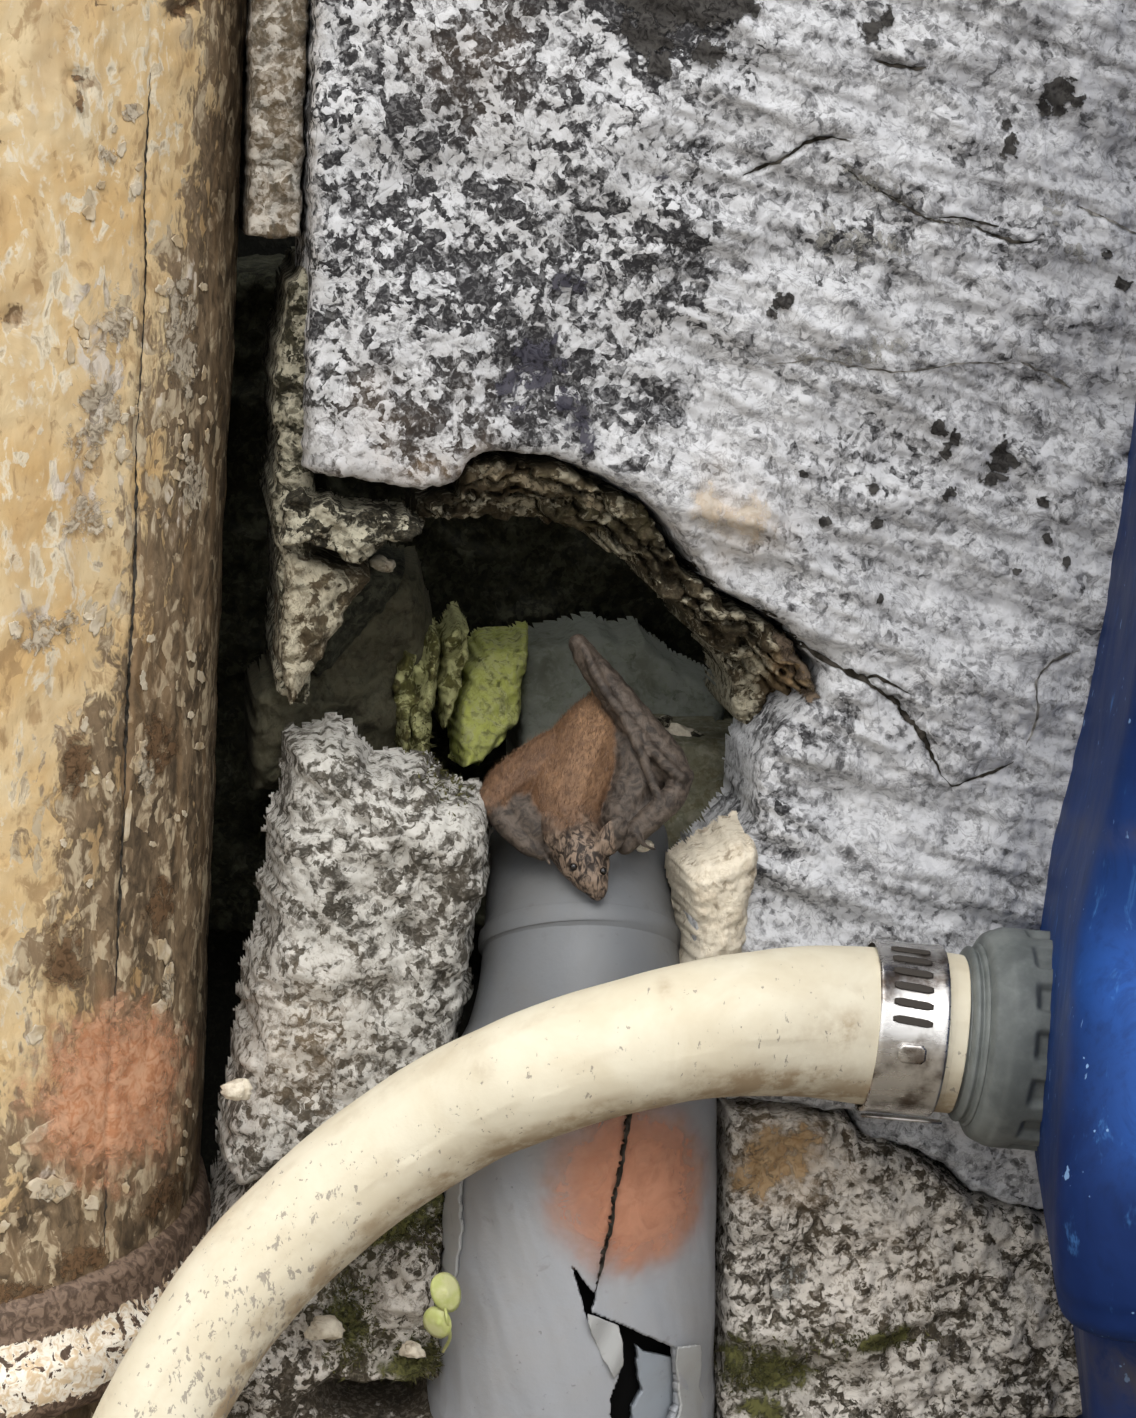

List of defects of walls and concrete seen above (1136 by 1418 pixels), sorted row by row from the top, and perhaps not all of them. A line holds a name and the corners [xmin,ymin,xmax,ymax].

crack [743,136,1043,244]
spalling [186,254,285,934]
spalling [313,451,821,724]
crack [669,547,1079,787]
spalling [430,710,507,785]
spalling [656,715,704,737]
spalling [474,895,486,931]
damp [859,1325,911,1353]
damp [736,1395,786,1418]